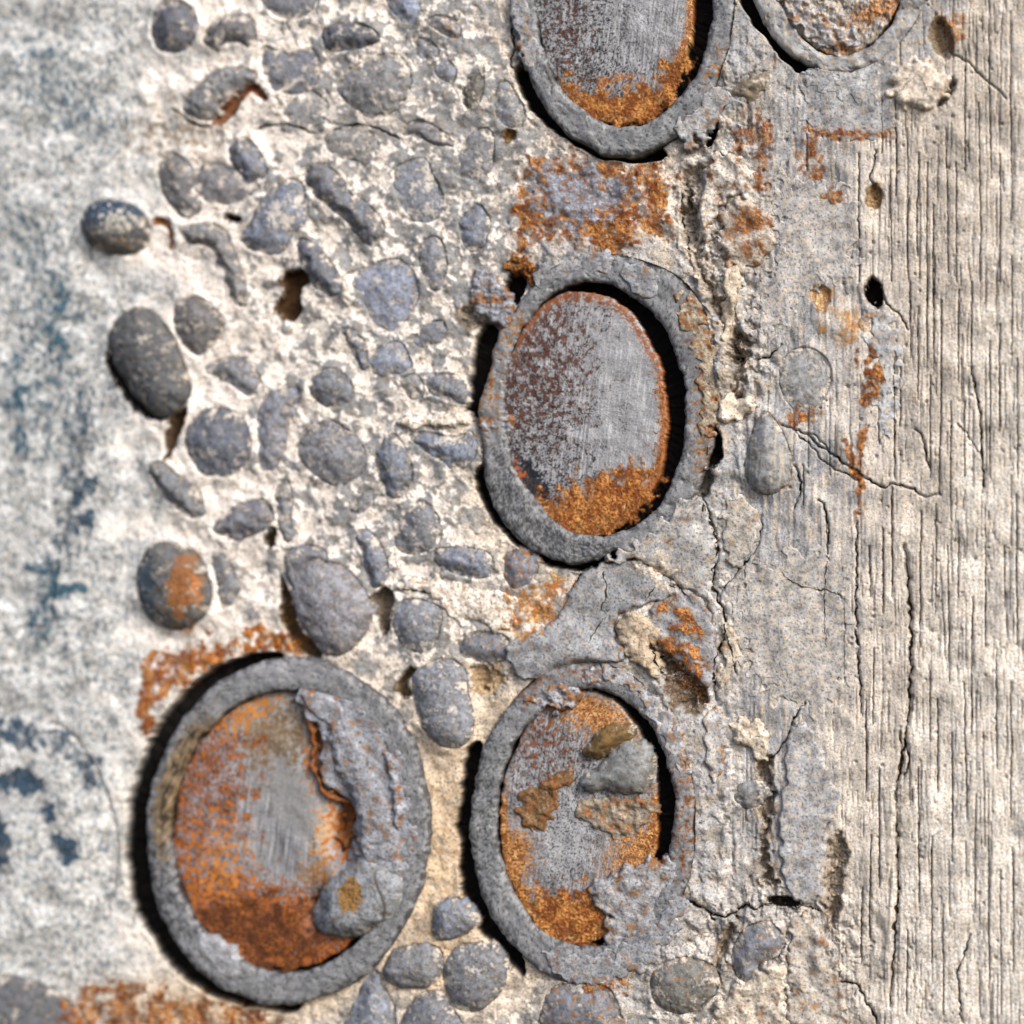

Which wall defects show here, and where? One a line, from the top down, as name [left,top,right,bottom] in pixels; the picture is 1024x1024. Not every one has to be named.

rust [560,49,698,128]
rust [502,143,688,287]
rust [816,286,885,407]
rust [535,455,669,536]
rust [842,427,869,518]
crack [781,43,1018,1023]
rust [135,622,313,736]
crack [775,704,805,755]
rust [514,765,575,832]
rust [197,888,322,972]
crack [689,900,770,921]
rust [56,980,283,1024]